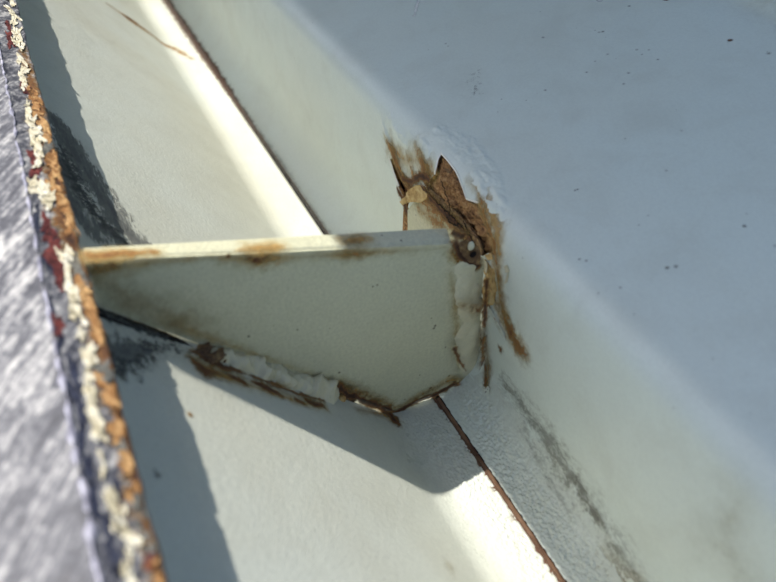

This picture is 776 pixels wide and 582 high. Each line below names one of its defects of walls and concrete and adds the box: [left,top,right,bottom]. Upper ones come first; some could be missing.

rust [20,46,159,295]
peeling [4,0,190,582]
rust [87,311,167,582]
rust [111,0,331,235]
rust [188,349,325,408]
rust [240,246,278,265]
rust [337,381,566,582]
rust [386,138,528,392]